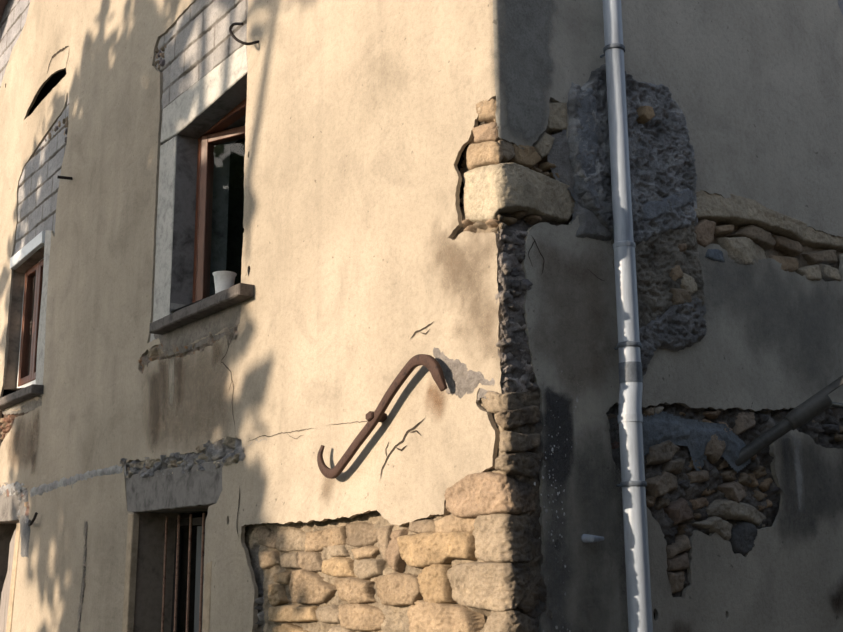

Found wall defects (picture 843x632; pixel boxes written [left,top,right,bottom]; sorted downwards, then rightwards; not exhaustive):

crack [47,46,69,73]
flaking render [693,190,843,282]
spalling [138,303,242,373]
spalling [495,230,536,394]
crack [221,334,366,442]
spalling [120,437,245,478]
crack [380,418,425,478]
damp [545,388,573,481]
spalling [0,481,30,557]